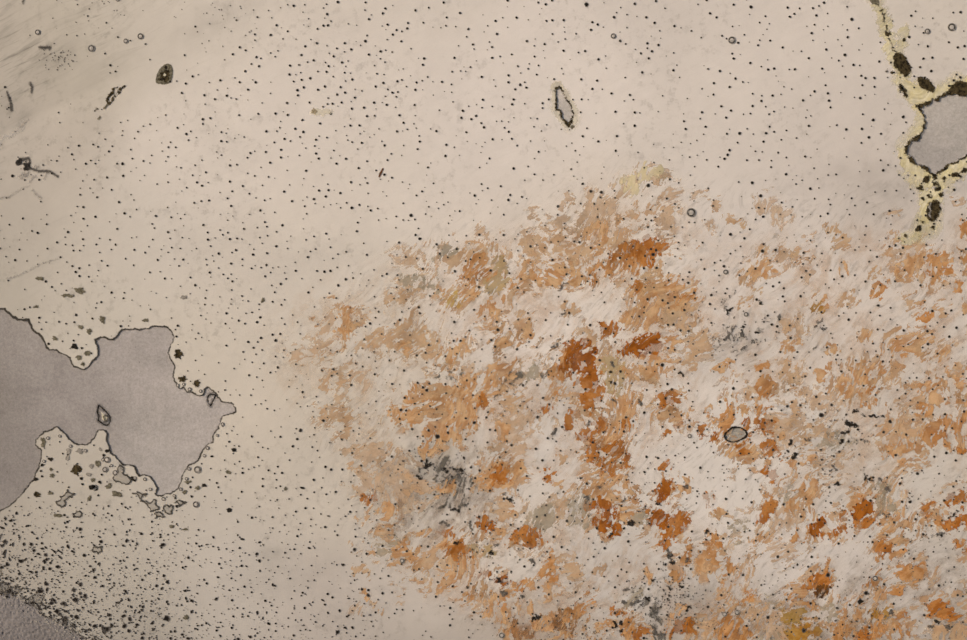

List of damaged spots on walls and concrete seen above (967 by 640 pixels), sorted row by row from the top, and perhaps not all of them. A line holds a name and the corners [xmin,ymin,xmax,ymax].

spalling [156,64,173,85]
peeling [551,81,578,129]
crack [870,0,935,98]
peeling [893,71,967,190]
crack [897,173,944,245]
peeling [0,305,236,531]
rust [289,161,967,640]
spalling [724,426,748,443]
spalling [0,536,111,640]